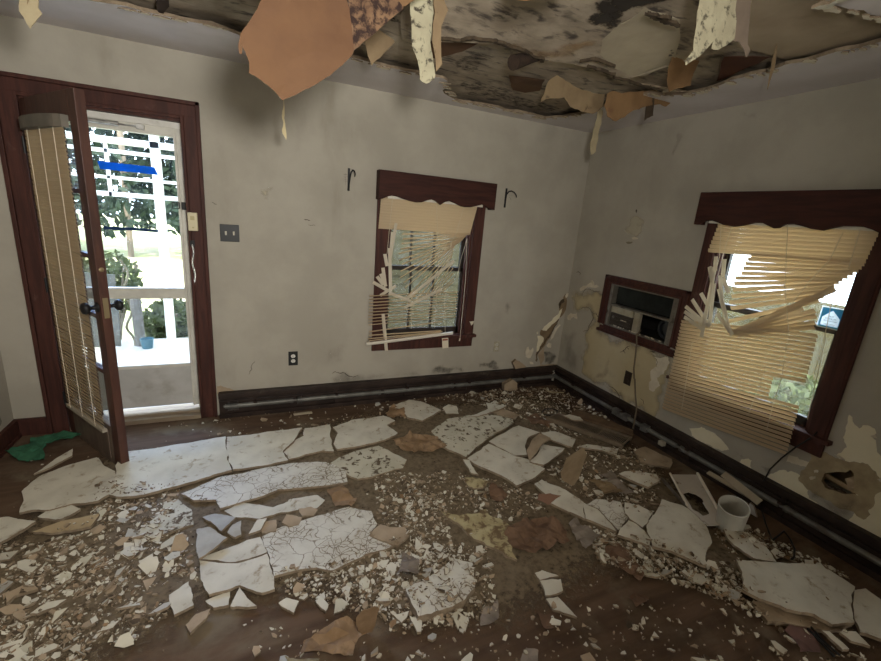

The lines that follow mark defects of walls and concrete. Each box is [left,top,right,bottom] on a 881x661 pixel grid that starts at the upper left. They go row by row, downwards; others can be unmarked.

leakage [588,0,665,29]
spalling [811,0,848,10]
spalling [525,293,577,367]
peeling [649,356,670,392]
spalling [768,415,881,537]